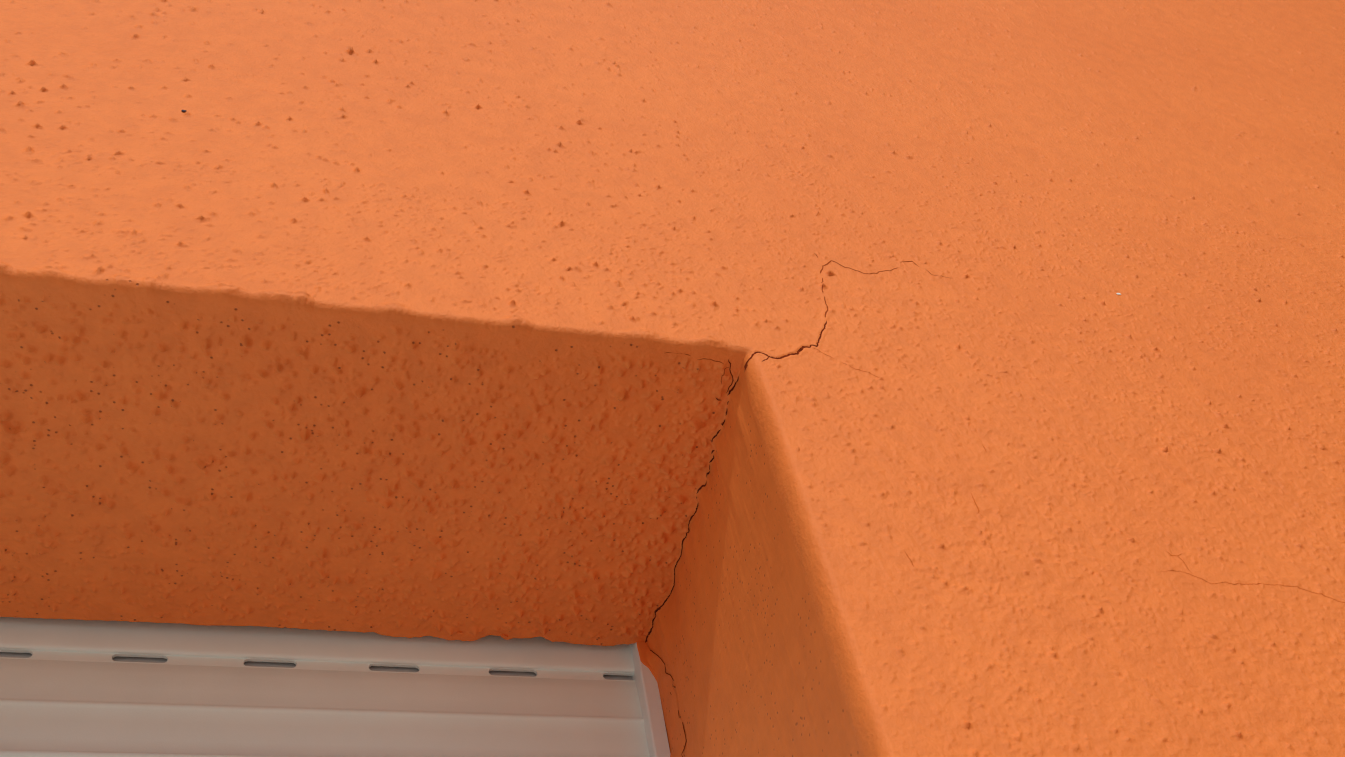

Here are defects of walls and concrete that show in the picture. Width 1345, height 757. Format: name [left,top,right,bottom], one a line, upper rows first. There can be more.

crack [645,255,949,757]
crack [1162,552,1345,603]